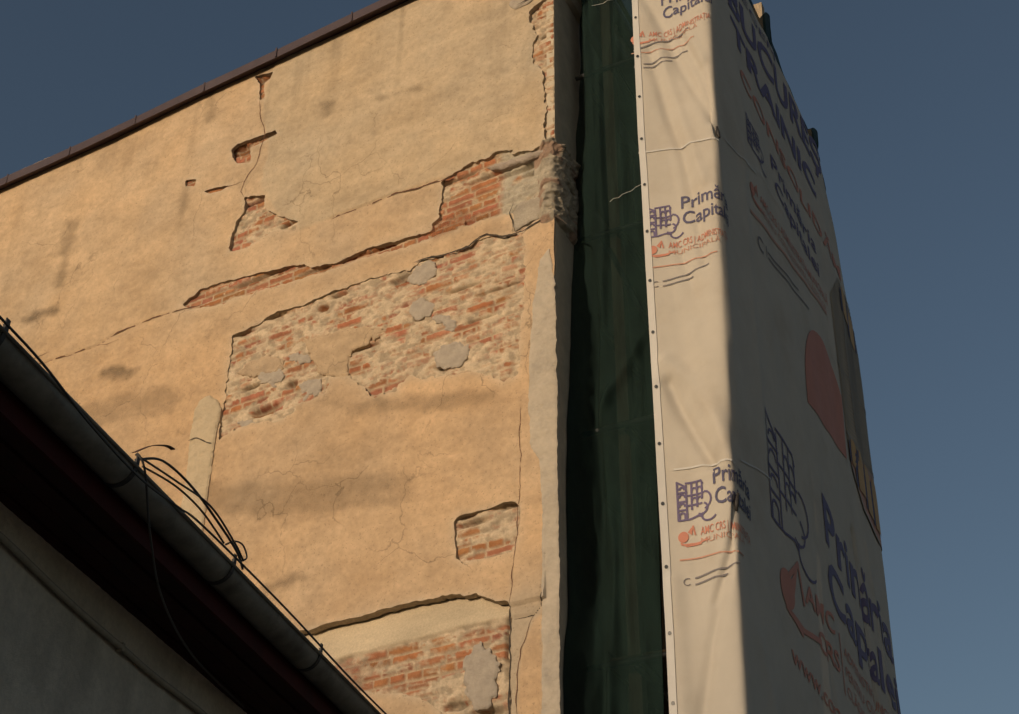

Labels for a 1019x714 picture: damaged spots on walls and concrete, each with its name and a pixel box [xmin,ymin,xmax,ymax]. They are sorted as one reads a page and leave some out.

spalling [257,76,271,100]
spalling [531,0,555,139]
crack [227,100,265,195]
spalling [234,135,274,163]
crack [35,305,200,364]
spalling [185,150,543,437]
spalling [455,504,521,564]
spalling [304,597,512,714]